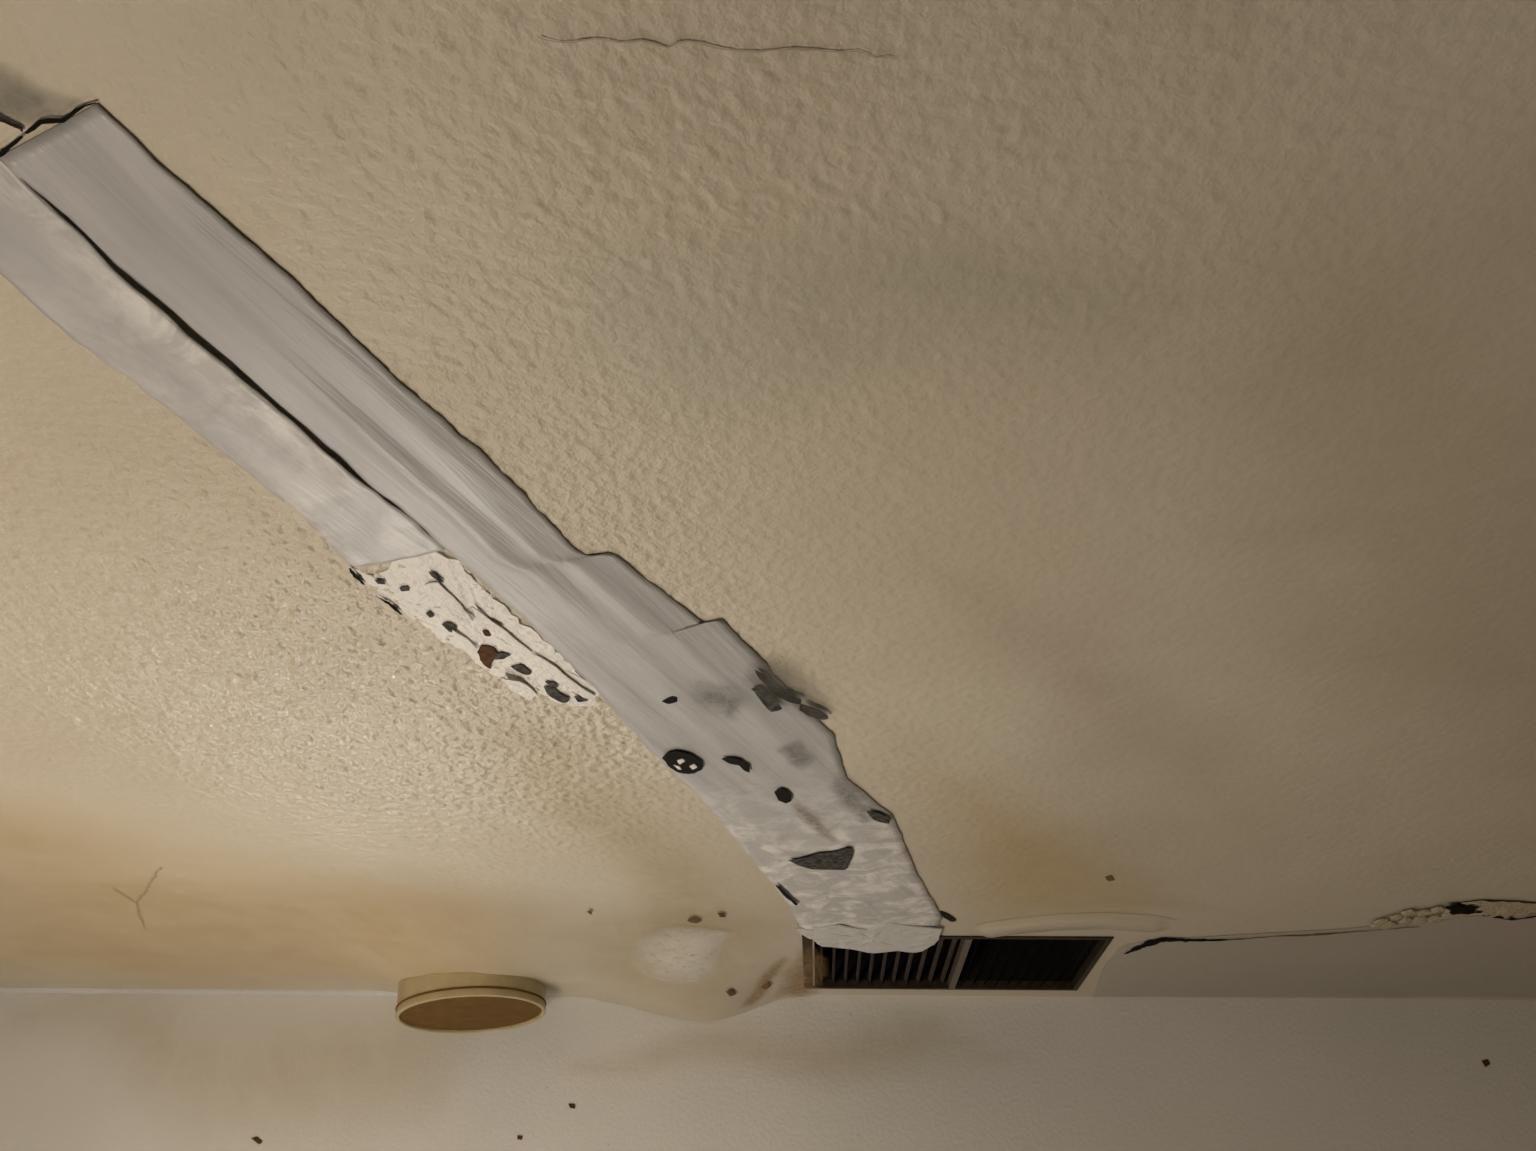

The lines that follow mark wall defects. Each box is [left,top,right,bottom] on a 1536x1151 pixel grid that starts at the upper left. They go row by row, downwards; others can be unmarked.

crack [0,102,97,157]
peeling [349,551,599,707]
damp [722,757,750,773]
damp [774,789,853,870]
crack [1125,927,1415,954]